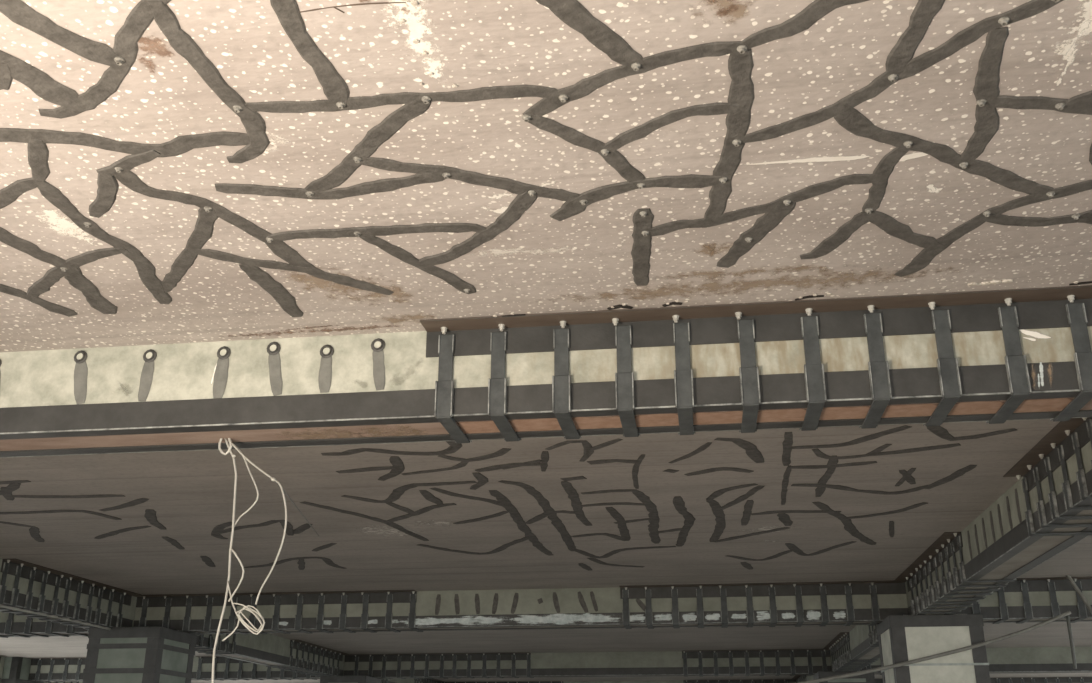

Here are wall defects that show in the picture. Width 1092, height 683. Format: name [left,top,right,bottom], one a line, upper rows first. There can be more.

rust [709,0,747,22]
rust [138,37,171,72]
water stain [1055,0,1092,86]
crack [0,425,1022,615]
water stain [509,613,620,625]